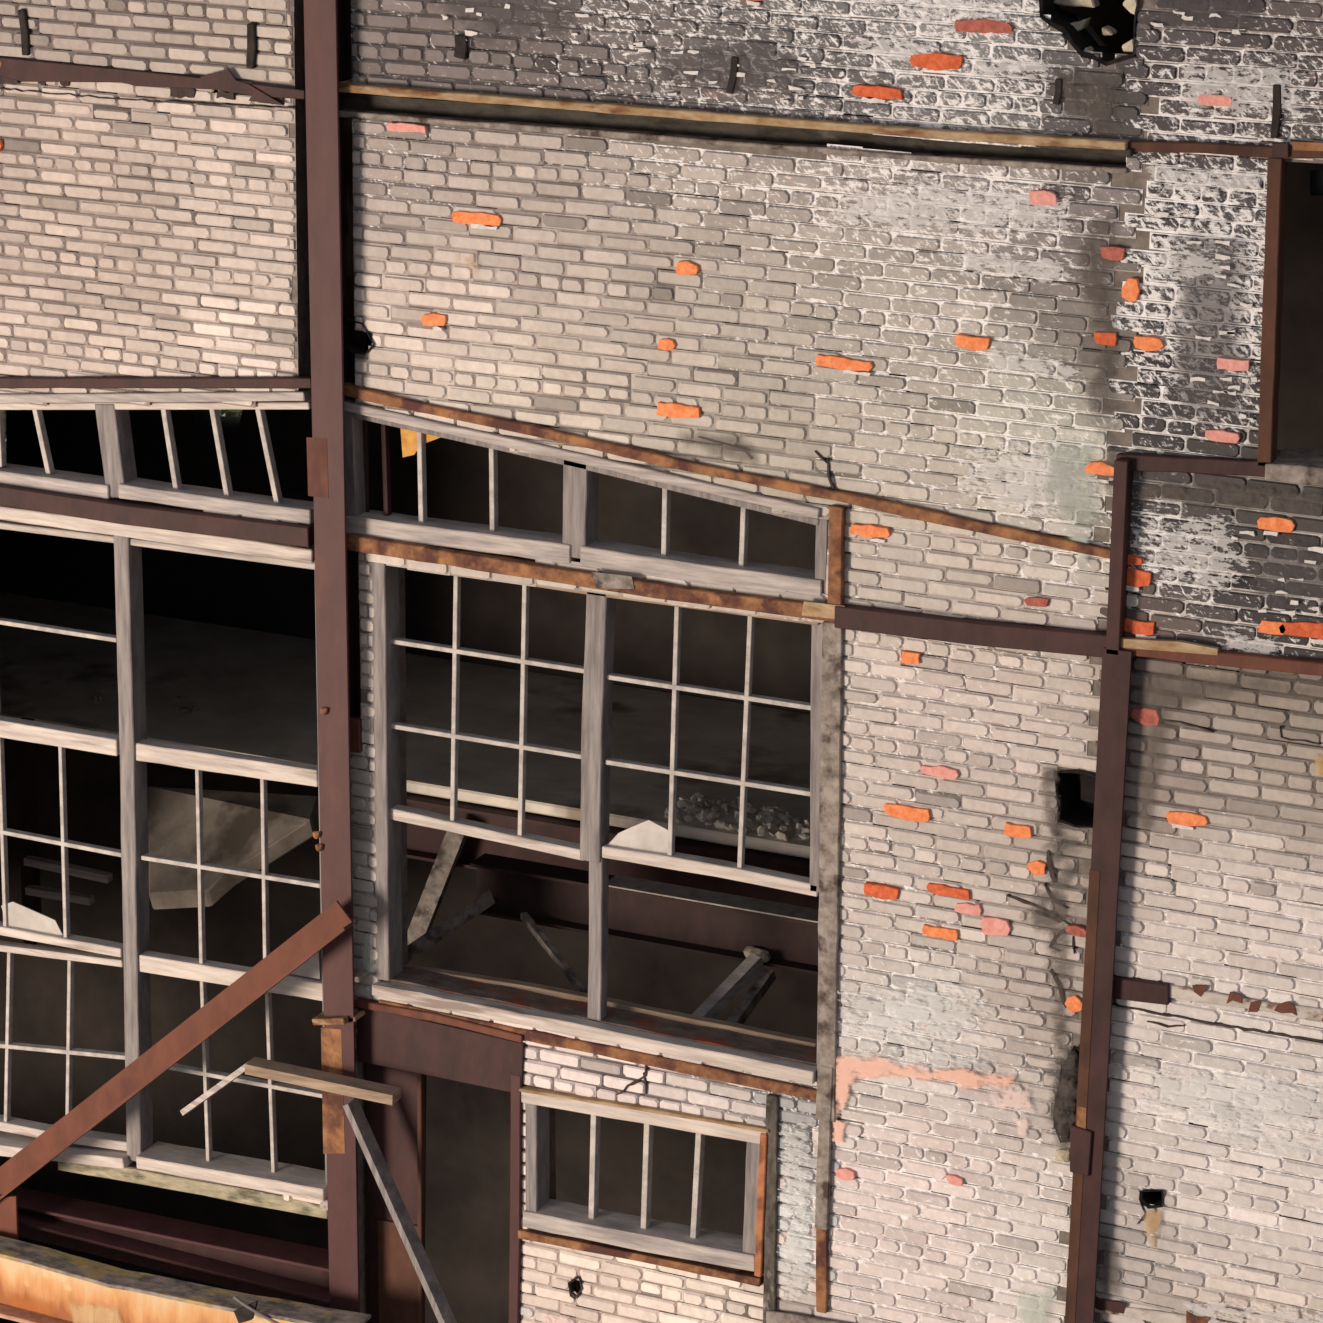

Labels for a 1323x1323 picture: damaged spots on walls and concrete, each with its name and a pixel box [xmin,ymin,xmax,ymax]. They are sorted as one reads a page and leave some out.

peeling [442,0,590,41]
spalling [1039,0,1246,66]
peeling [629,42,817,102]
spalling [1126,554,1152,592]
peeling [1231,516,1323,645]
spalling [1124,618,1157,639]
crack [1006,894,1075,954]
rust [1192,985,1208,997]
rust [1226,992,1297,1016]